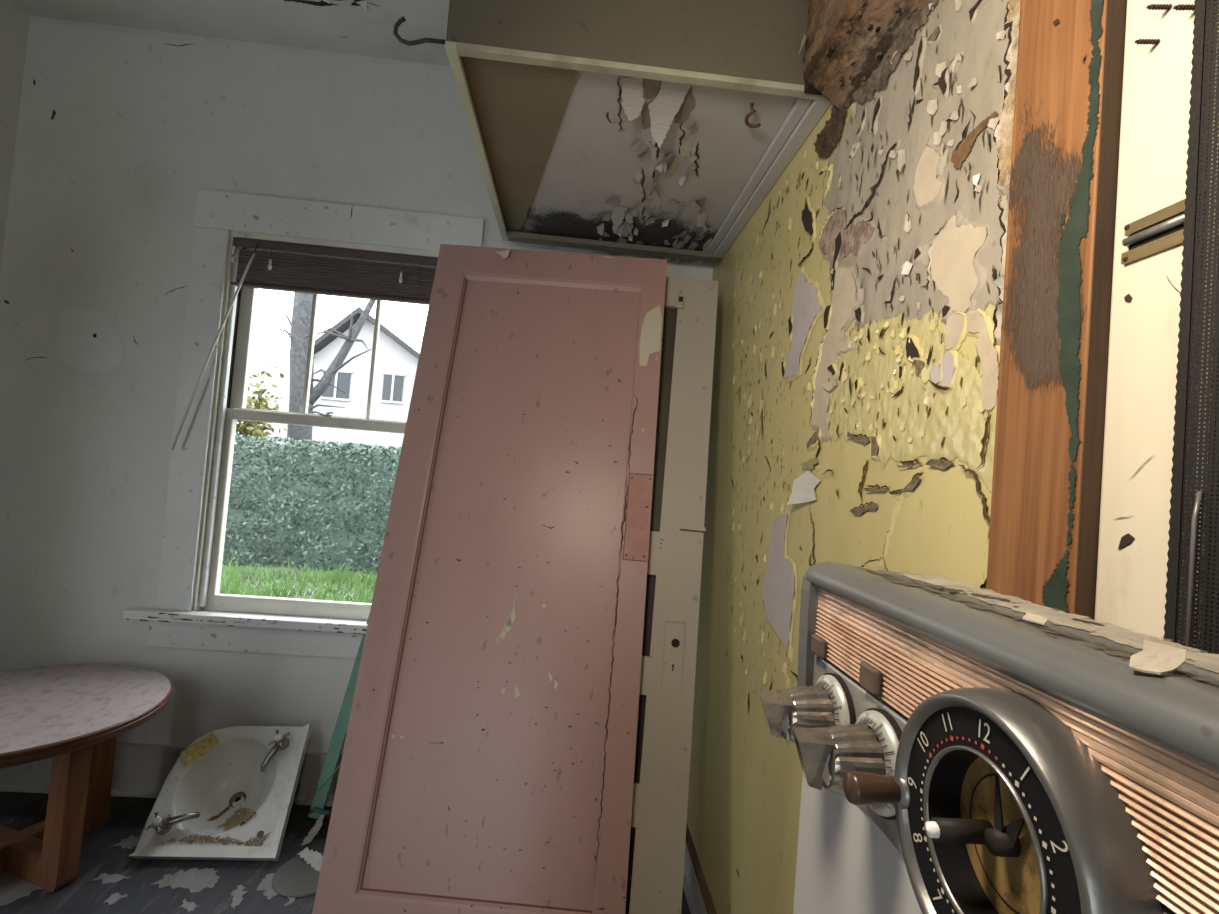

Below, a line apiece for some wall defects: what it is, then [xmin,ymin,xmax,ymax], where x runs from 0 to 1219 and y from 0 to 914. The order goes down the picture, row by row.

crack [280,0,379,11]
crack [946,3,1014,152]
peeling [597,77,712,264]
crack [757,95,1009,442]
peeling [762,0,1021,651]
damp [992,88,1083,403]
crack [799,330,869,568]
crack [959,410,990,589]
peeling [0,872,43,906]
peeling [92,873,132,905]
peeling [150,868,220,912]
peeling [231,873,296,909]